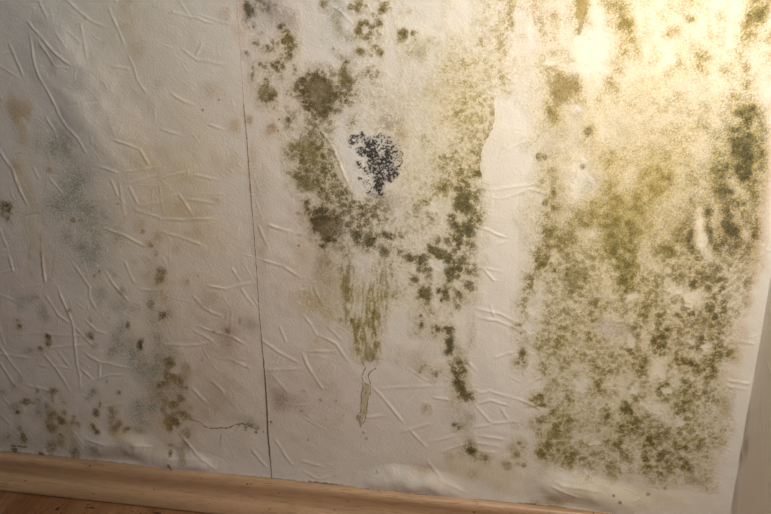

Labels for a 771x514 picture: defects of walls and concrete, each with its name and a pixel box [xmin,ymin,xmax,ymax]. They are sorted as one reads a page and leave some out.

leakage [0,0,353,482]
leakage [267,0,771,514]